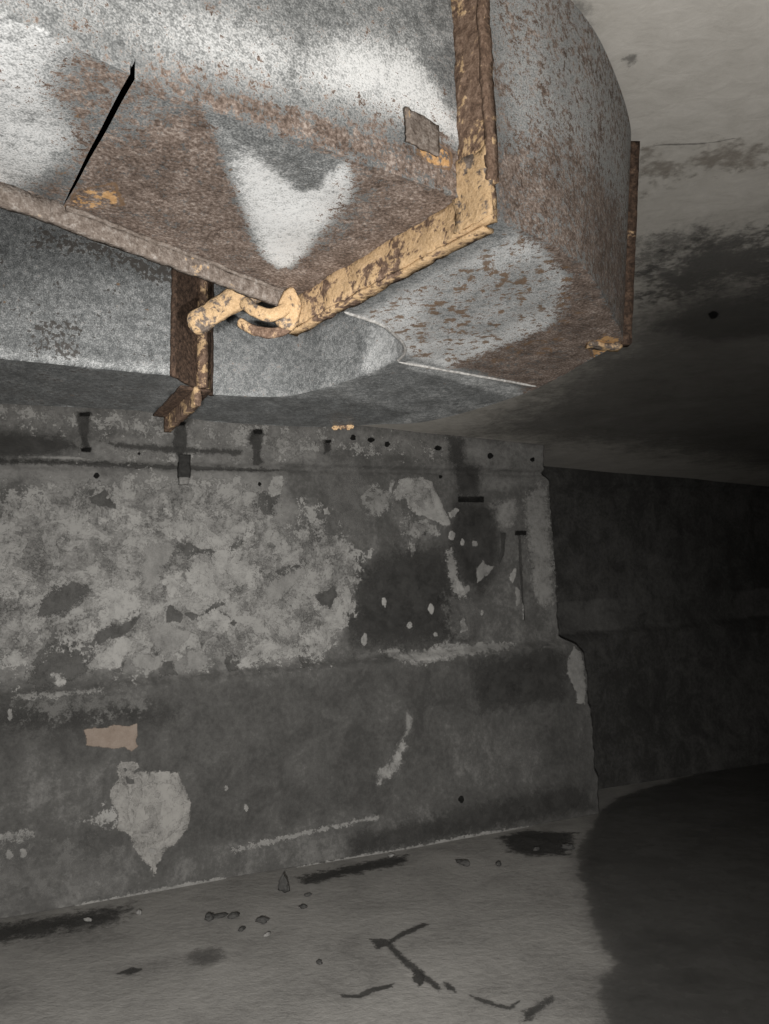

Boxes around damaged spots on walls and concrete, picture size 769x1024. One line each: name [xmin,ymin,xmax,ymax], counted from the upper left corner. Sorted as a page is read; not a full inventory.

damp [514,234,769,462]
peeling [0,404,448,876]
flaking render [360,477,517,669]
peeling [488,477,557,610]
damp [296,788,593,884]
crack [340,923,553,1021]